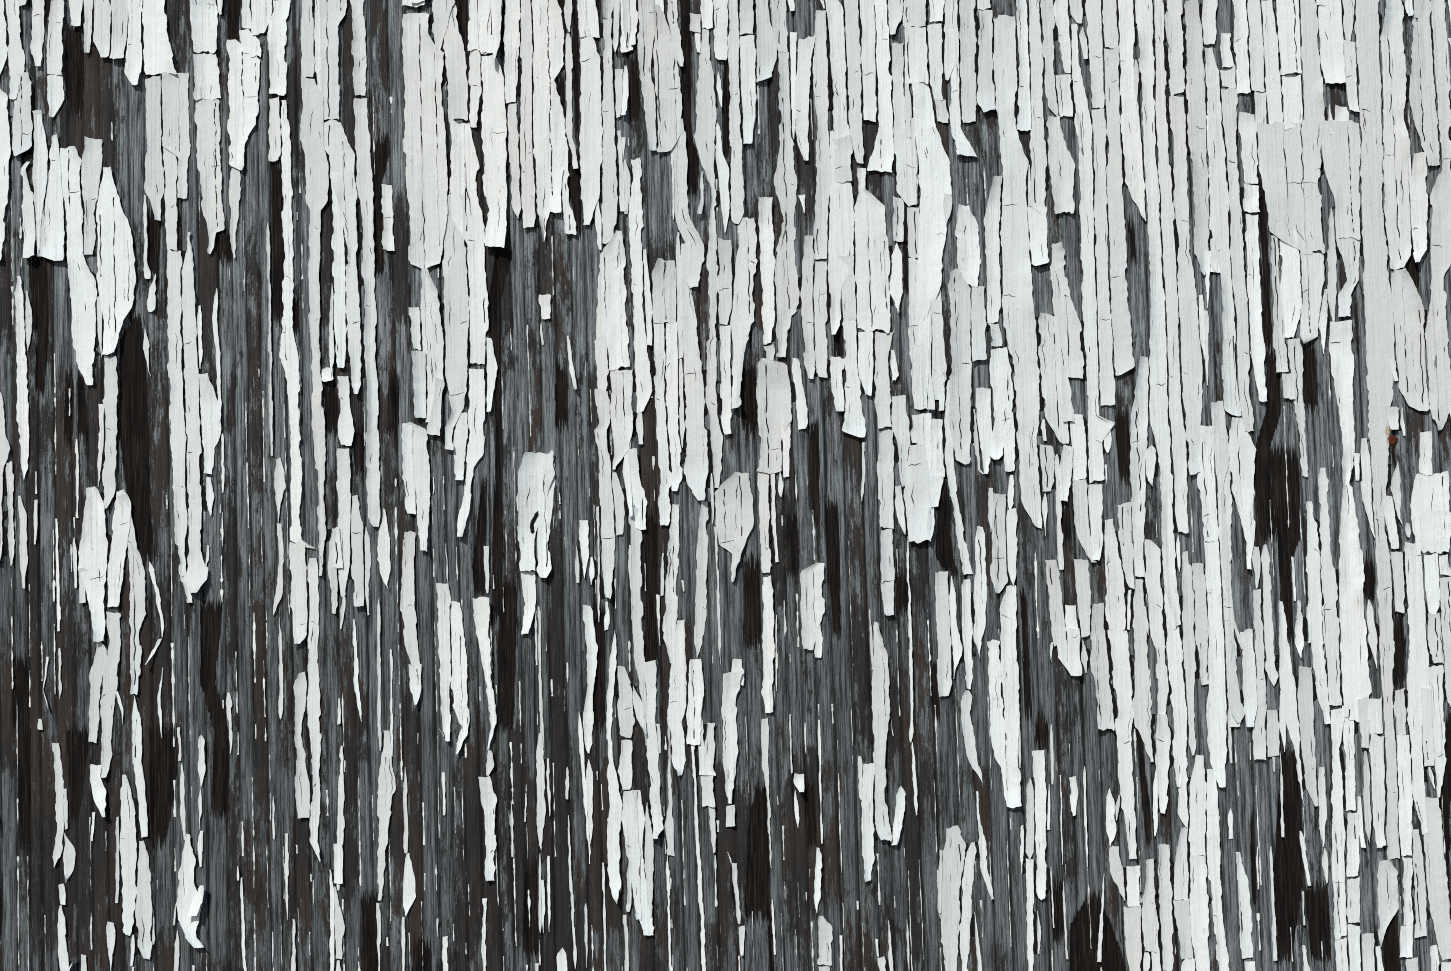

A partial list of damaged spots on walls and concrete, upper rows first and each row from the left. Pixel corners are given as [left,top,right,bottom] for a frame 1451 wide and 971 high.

peeling [0,0,398,971]